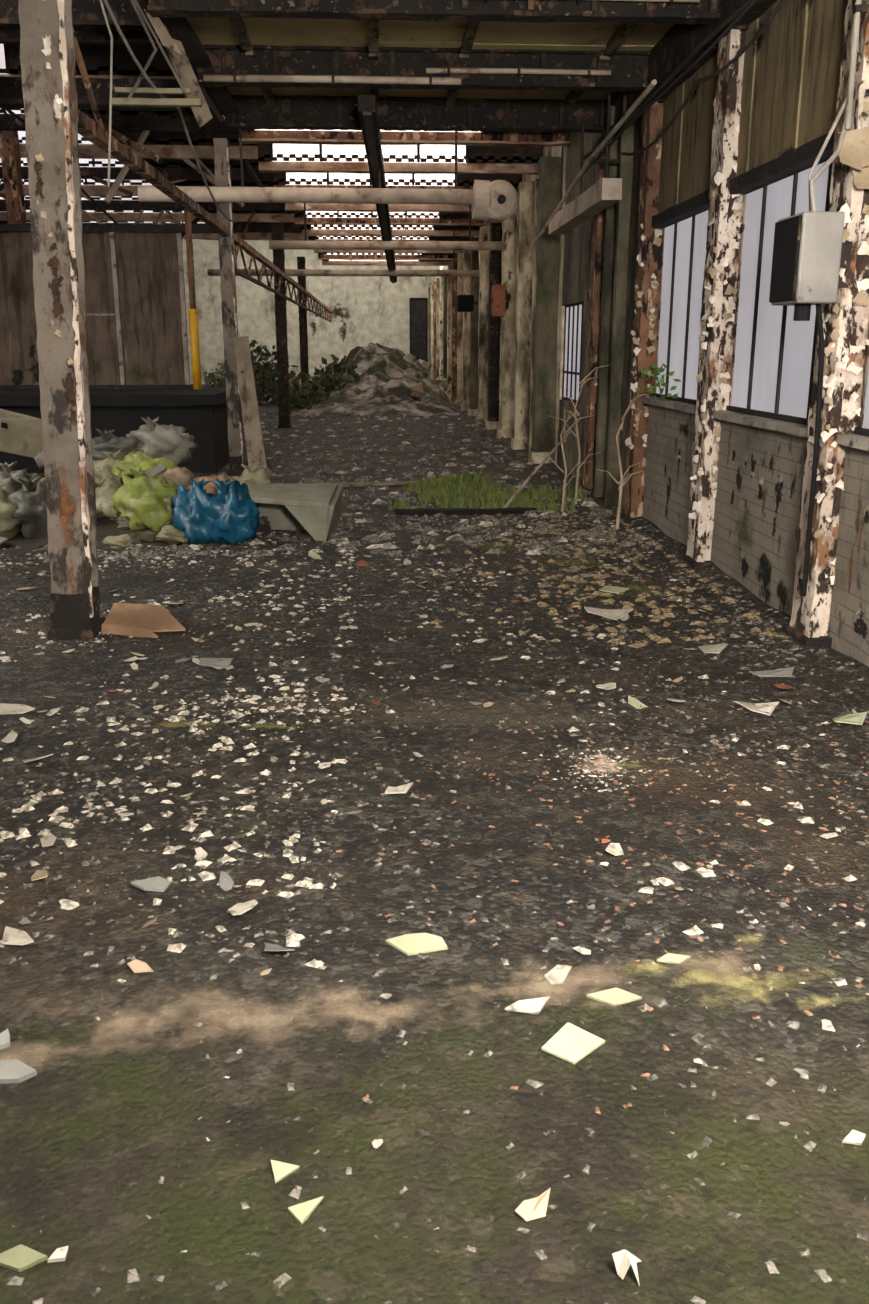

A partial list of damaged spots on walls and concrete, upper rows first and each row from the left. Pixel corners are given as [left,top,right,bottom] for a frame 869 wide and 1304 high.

peeling [838,89,869,189]
peeling [699,103,746,356]
peeling [839,203,869,255]
peeling [625,224,662,486]
peeling [664,268,869,536]
peeling [799,515,838,592]
spalling [854,608,868,656]